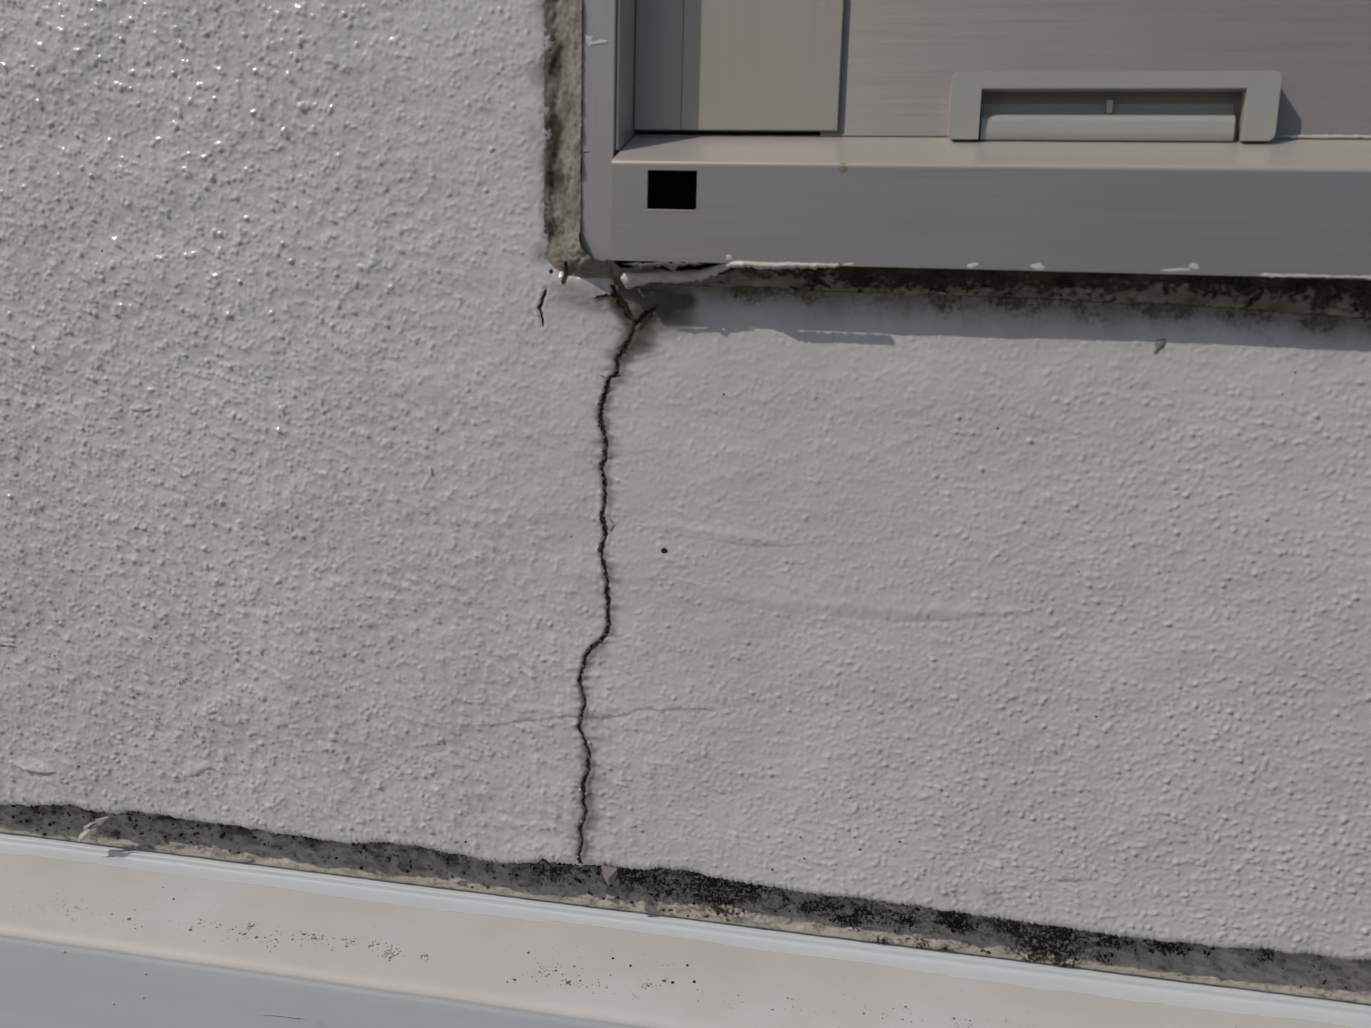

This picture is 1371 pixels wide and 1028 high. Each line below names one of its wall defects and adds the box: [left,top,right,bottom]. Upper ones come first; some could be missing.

water stain [549,43,563,77]
water stain [545,115,564,191]
water stain [608,286,695,343]
water stain [731,266,1371,332]
crack [576,284,656,867]
water stain [1,804,1216,968]